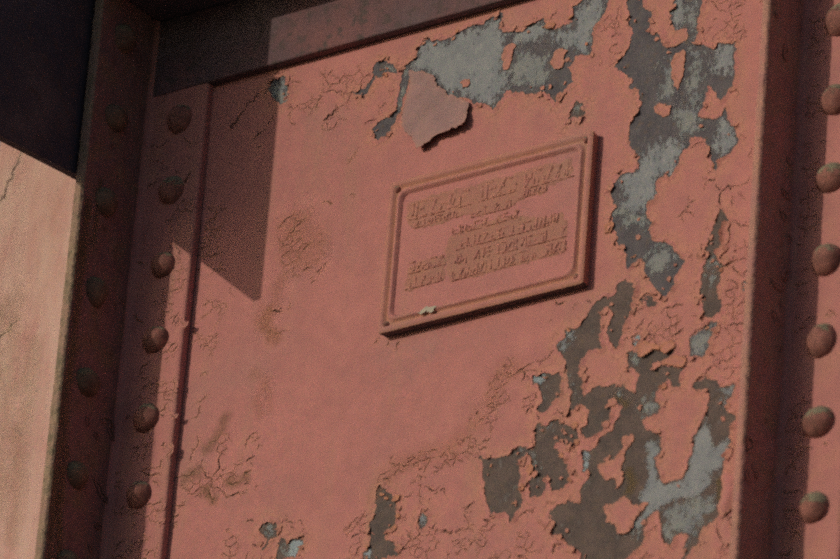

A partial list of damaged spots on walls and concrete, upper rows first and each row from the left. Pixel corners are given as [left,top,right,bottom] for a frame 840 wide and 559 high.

peeling [260,71,294,109]
peeling [347,0,612,148]
crack [0,152,23,204]
crack [276,192,356,285]
peeling [475,0,743,559]
crack [262,301,293,342]
crack [86,198,263,559]
crack [221,517,273,559]
peeling [254,516,310,559]
crack [343,510,375,559]
peeling [358,481,404,559]